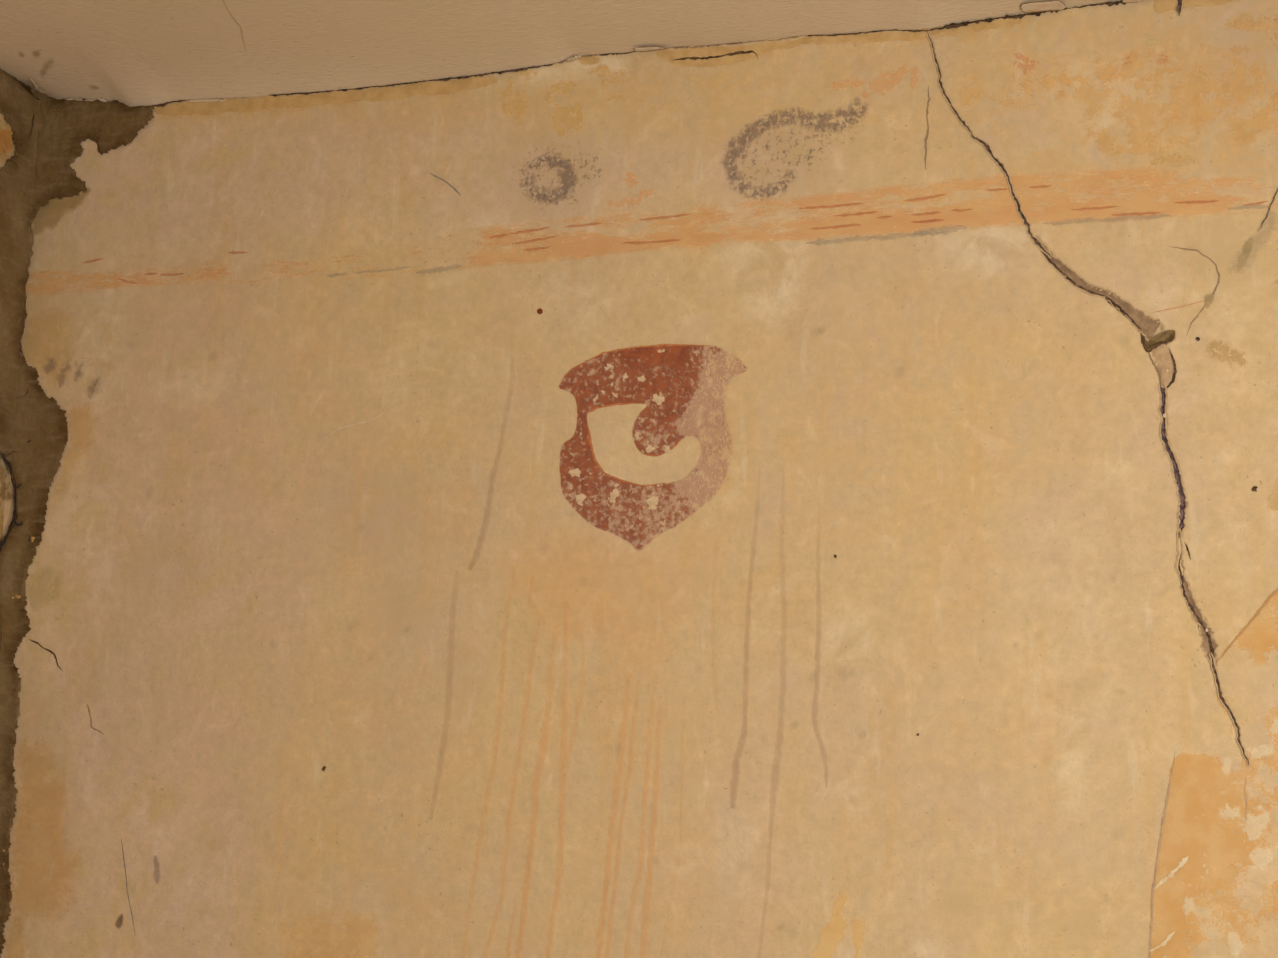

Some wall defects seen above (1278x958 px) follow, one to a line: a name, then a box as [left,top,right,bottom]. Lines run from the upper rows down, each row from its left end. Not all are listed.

crack [64,0,1250,824]
crack [1233,187,1278,270]